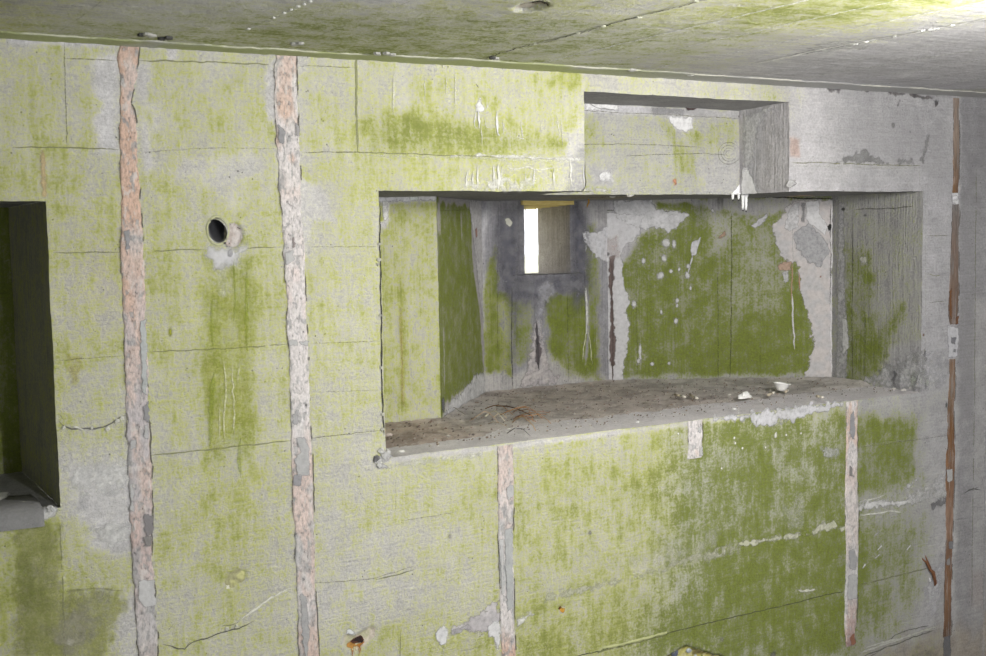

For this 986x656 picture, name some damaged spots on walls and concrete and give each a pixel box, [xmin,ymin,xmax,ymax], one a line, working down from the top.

crack [487,0,703,58]
water stain [474,98,504,138]
water stain [465,153,580,190]
spalling [224,223,242,247]
peeling [751,199,849,378]
water stain [583,288,597,360]
water stain [859,477,946,516]
water stain [640,520,845,577]
crack [163,587,292,650]
crack [667,592,841,634]